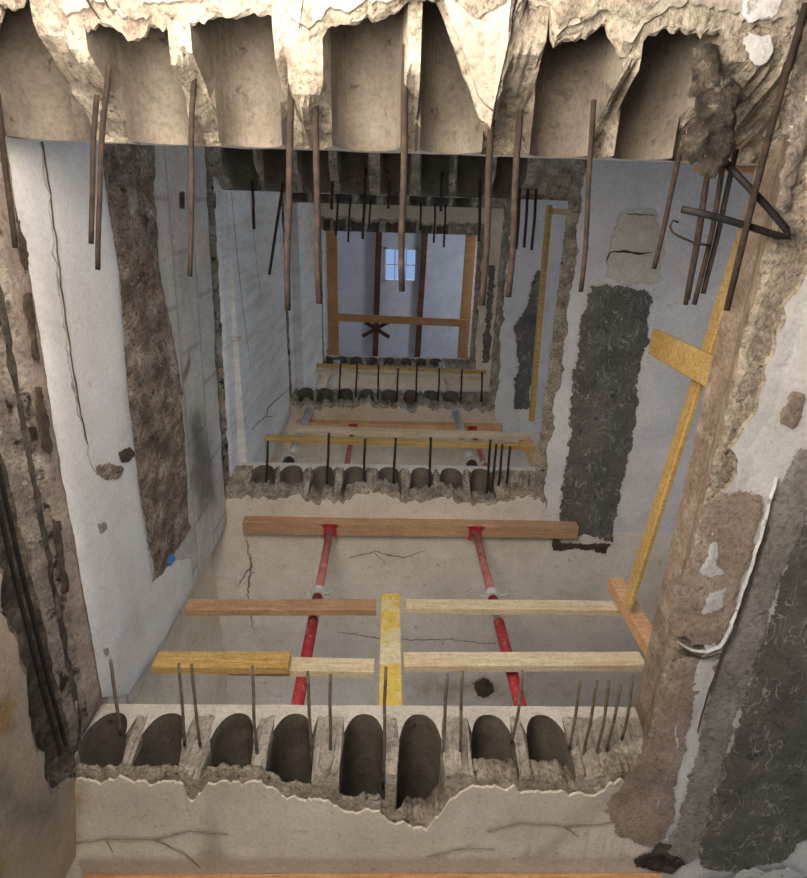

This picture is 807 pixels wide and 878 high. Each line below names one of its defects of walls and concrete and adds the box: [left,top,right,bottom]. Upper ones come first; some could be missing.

peeling [741,0,782,65]
spalling [679,43,746,179]
spalling [775,0,807,212]
spalling [22,292,40,361]
crack [40,141,101,475]
flaking render [513,270,541,410]
flaking render [551,209,665,554]
peeling [780,391,805,429]
flaking render [605,448,807,878]
crack [682,525,769,733]
crack [76,830,229,867]
crack [426,821,612,857]